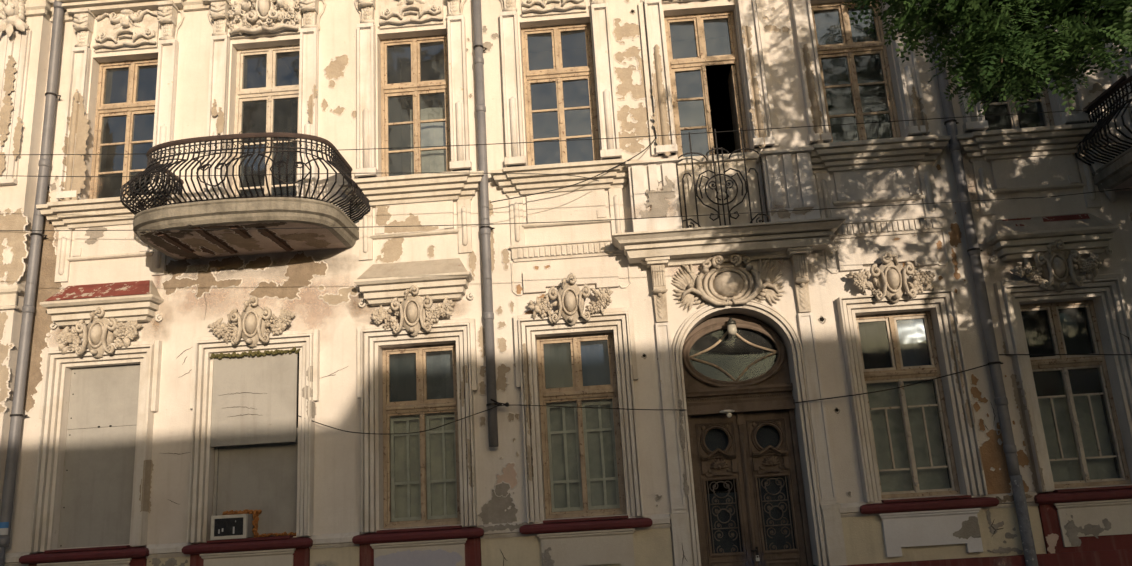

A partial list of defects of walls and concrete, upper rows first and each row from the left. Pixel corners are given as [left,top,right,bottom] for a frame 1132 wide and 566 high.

peeling [0,55,24,175]
peeling [211,99,225,134]
peeling [307,54,357,124]
peeling [612,0,672,156]
peeling [0,207,30,286]
peeling [85,226,107,245]
peeling [140,222,359,306]
peeling [375,205,438,264]
peeling [935,211,967,295]
peeling [0,311,14,414]
flaking render [459,283,553,525]
flaking render [947,315,1046,554]